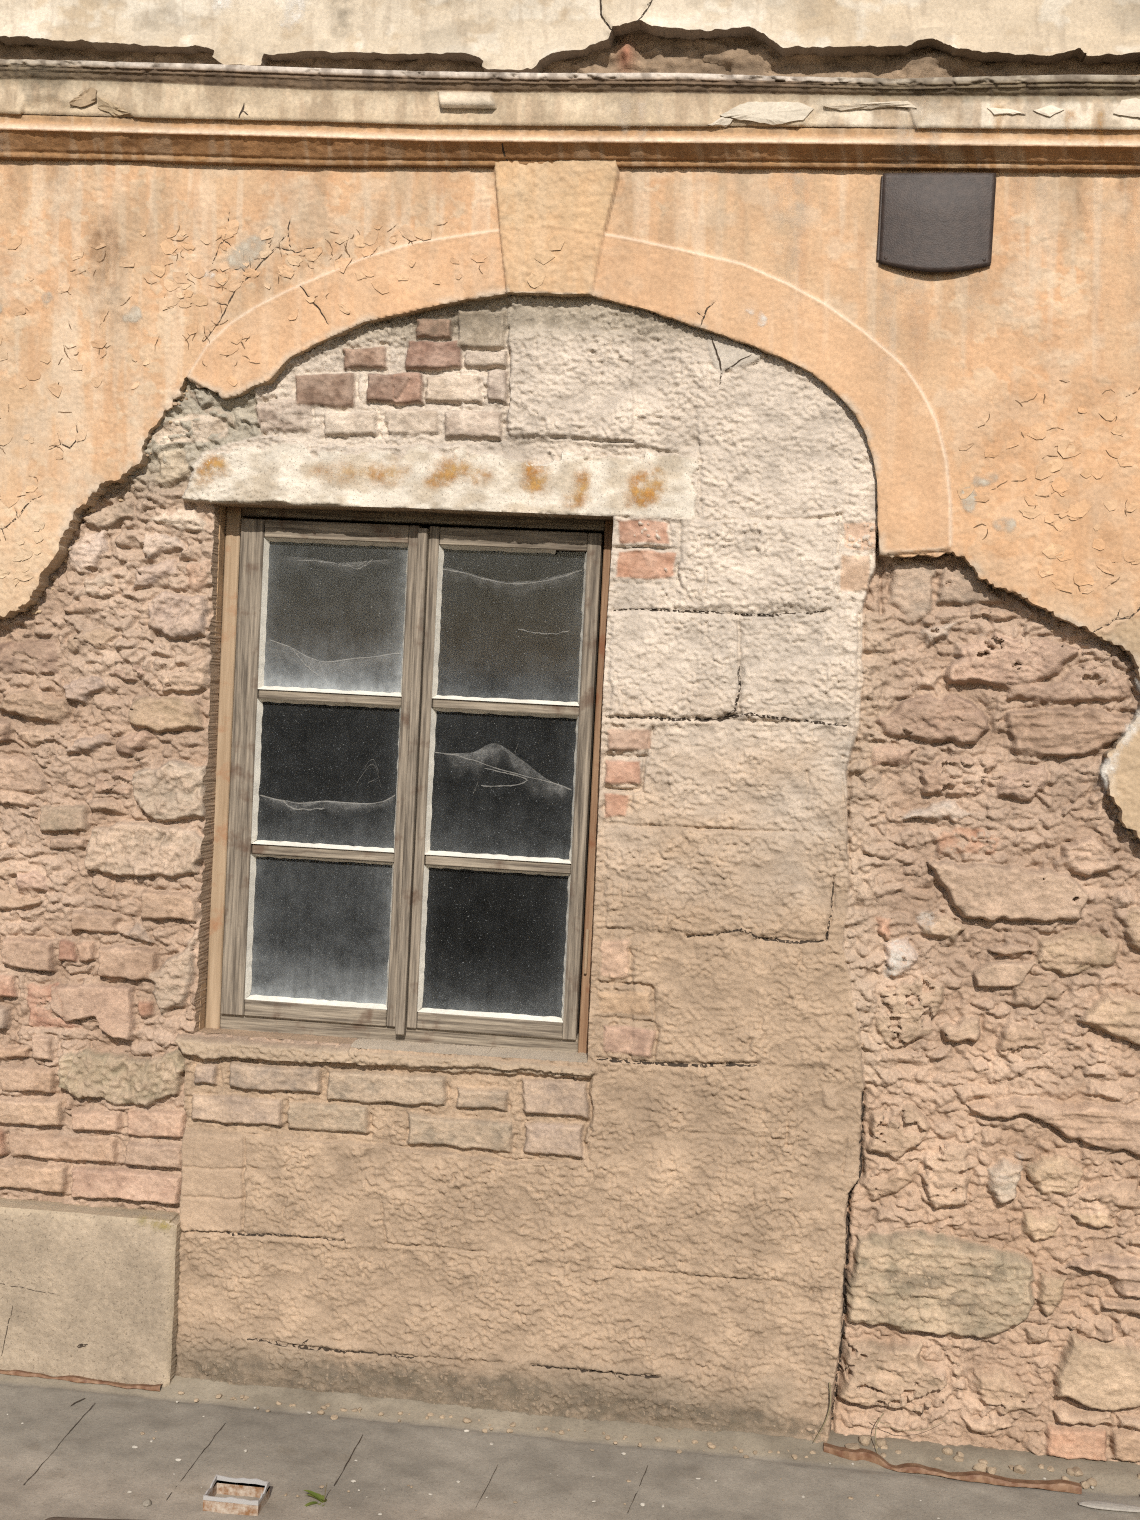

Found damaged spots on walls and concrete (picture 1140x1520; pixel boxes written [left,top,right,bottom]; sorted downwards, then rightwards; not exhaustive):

crack [600,0,652,31]
spalling [0,41,218,64]
spalling [265,57,484,72]
spalling [541,30,1140,79]
spalling [0,295,597,1215]
spalling [831,547,1140,1465]